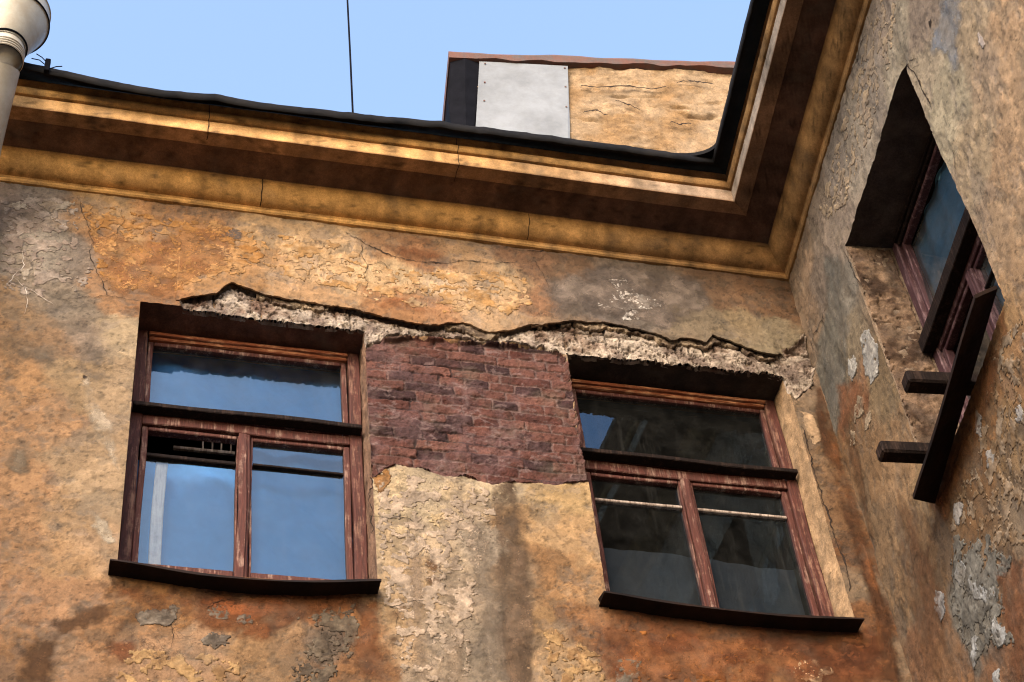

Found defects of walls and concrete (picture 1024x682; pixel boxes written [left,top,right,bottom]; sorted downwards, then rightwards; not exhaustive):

crack [581,80,713,115]
crack [7,202,133,311]
flaking render [0,193,822,682]
leakage [410,555,422,616]
leakage [468,482,533,682]
flaking render [848,247,944,449]
peeling [934,318,1024,670]